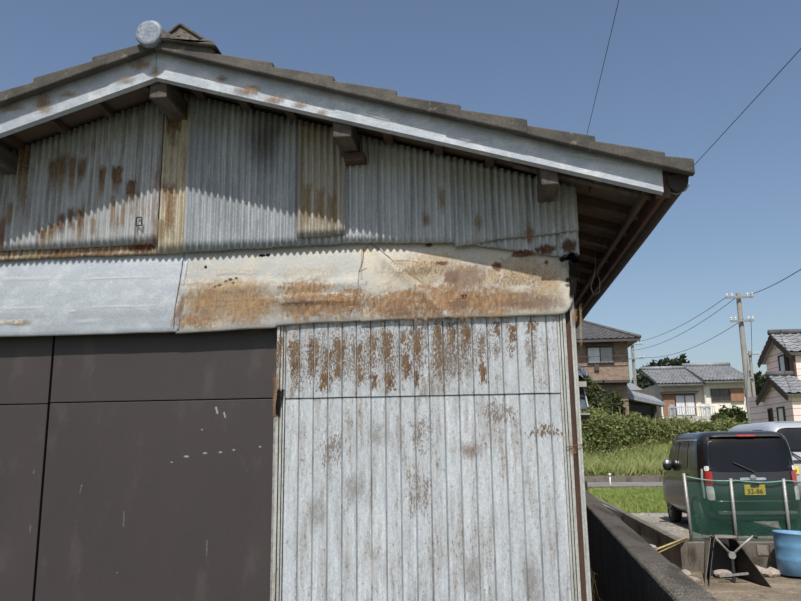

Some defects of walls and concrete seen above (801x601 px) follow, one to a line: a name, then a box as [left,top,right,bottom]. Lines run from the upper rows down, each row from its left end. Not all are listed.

corrosion [51,157,86,187]
corrosion [99,166,136,225]
corrosion [304,188,336,223]
corrosion [40,209,95,243]
corrosion [128,242,155,252]
corrosion [512,211,576,264]
corrosion [175,261,557,416]